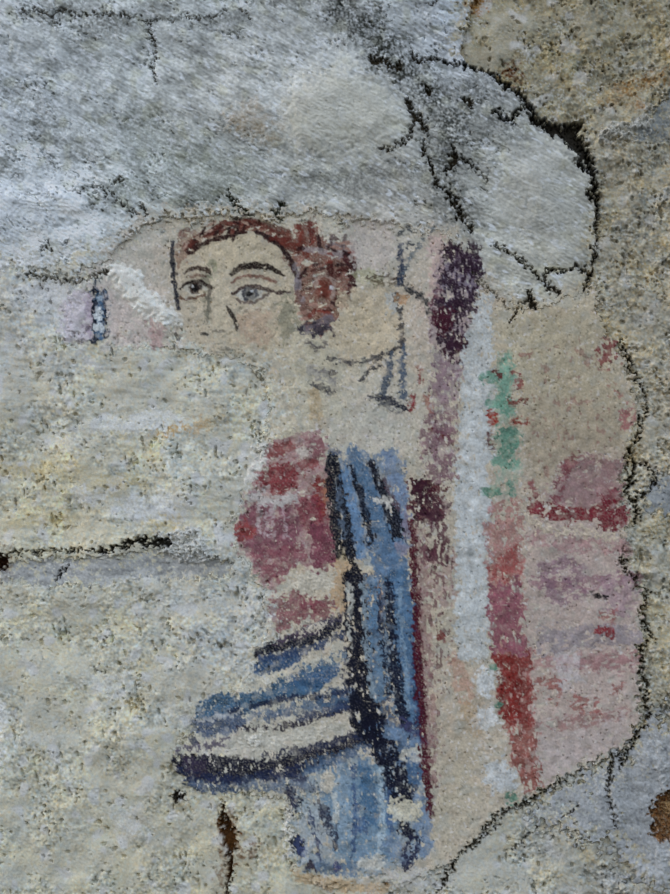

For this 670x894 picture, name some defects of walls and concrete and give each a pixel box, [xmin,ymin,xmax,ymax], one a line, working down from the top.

crack [20,5,252,87]
crack [70,173,149,222]
crack [225,187,289,225]
crack [364,45,605,324]
crack [21,234,111,287]
crack [616,337,664,528]
crack [7,531,173,582]
crack [433,553,658,894]
rust [206,795,271,894]